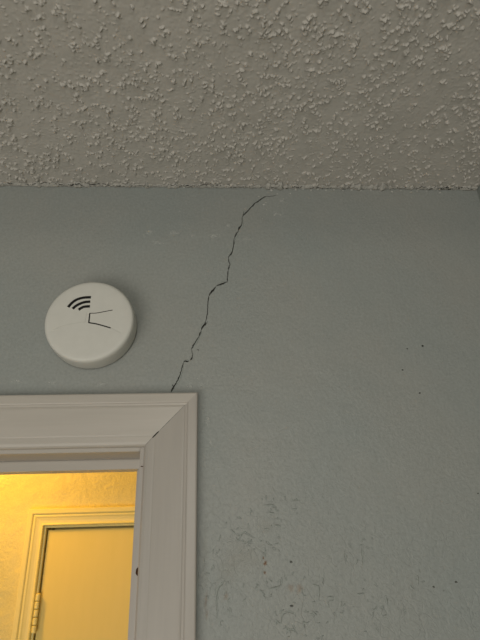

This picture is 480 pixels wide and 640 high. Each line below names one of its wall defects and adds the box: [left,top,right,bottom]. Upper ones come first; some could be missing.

crack [171,185,358,393]